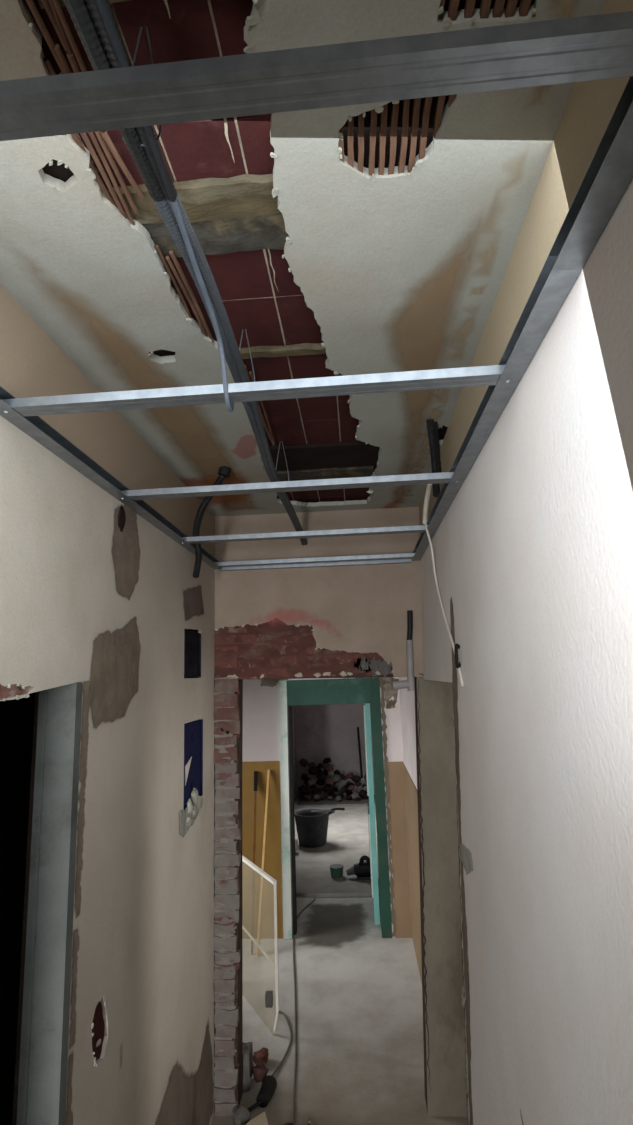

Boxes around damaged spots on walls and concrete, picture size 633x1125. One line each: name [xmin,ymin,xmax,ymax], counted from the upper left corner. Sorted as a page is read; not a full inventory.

flaking render [438,0,537,28]
flaking render [338,94,457,182]
flaking render [42,159,96,189]
flaking render [149,350,175,364]
spalling [118,504,126,532]
flaking render [0,683,34,701]
flaking render [213,618,399,1116]
crack [418,673,431,1092]
crack [450,597,473,1125]
flaking render [91,1001,106,1067]